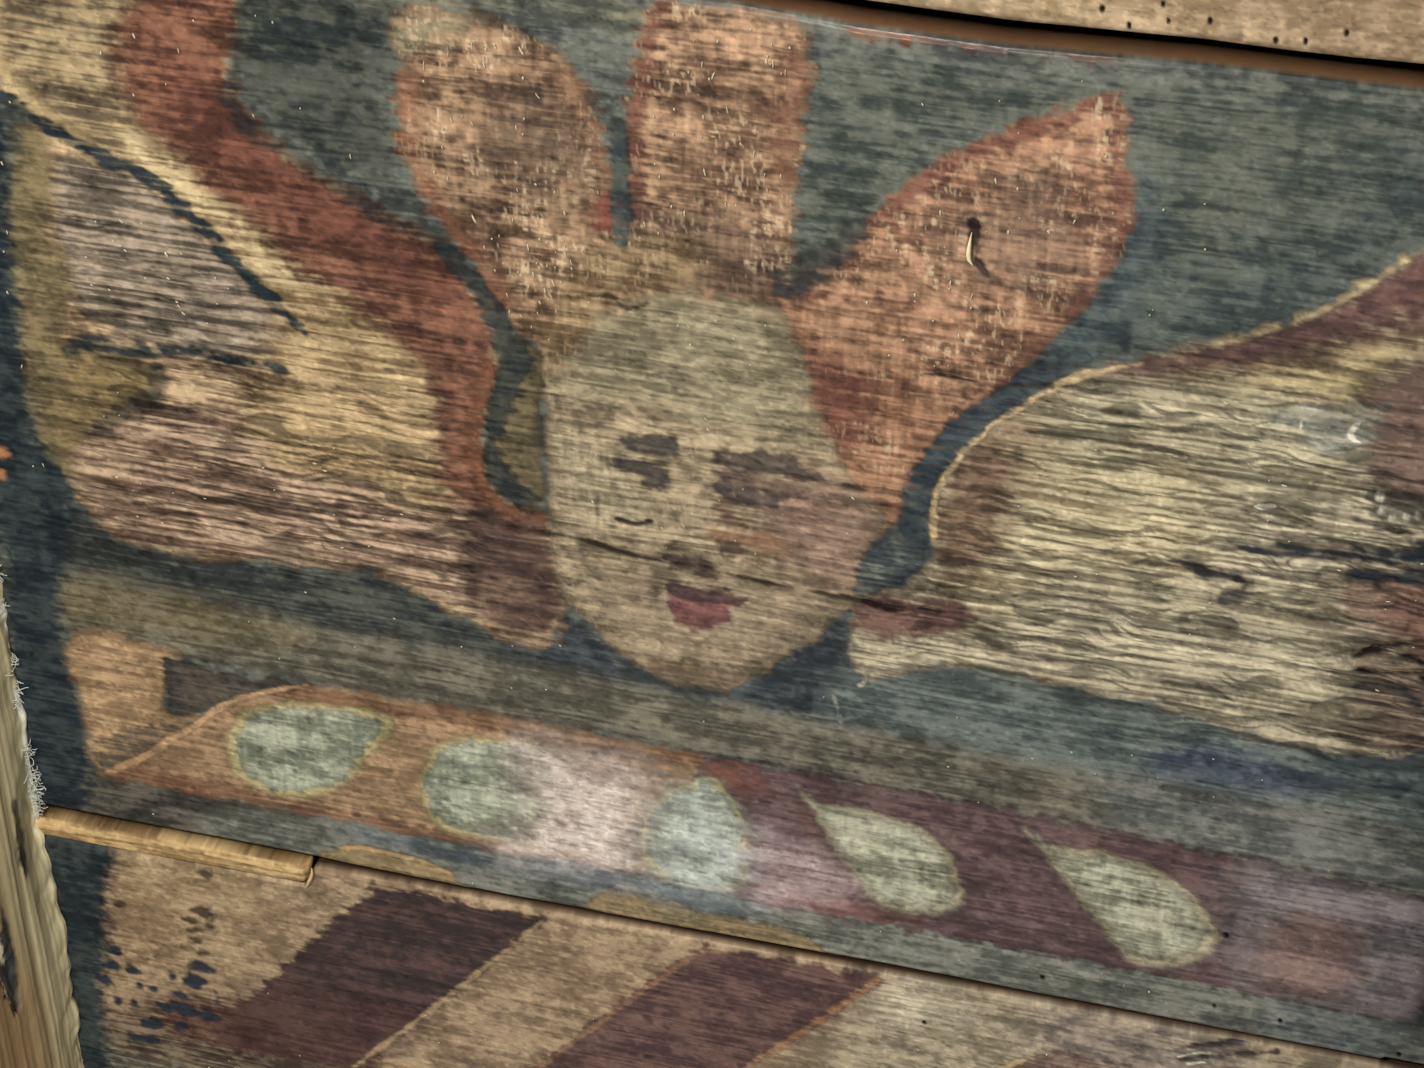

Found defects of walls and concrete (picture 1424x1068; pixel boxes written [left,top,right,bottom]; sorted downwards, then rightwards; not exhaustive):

crack [1352,642,1424,682]